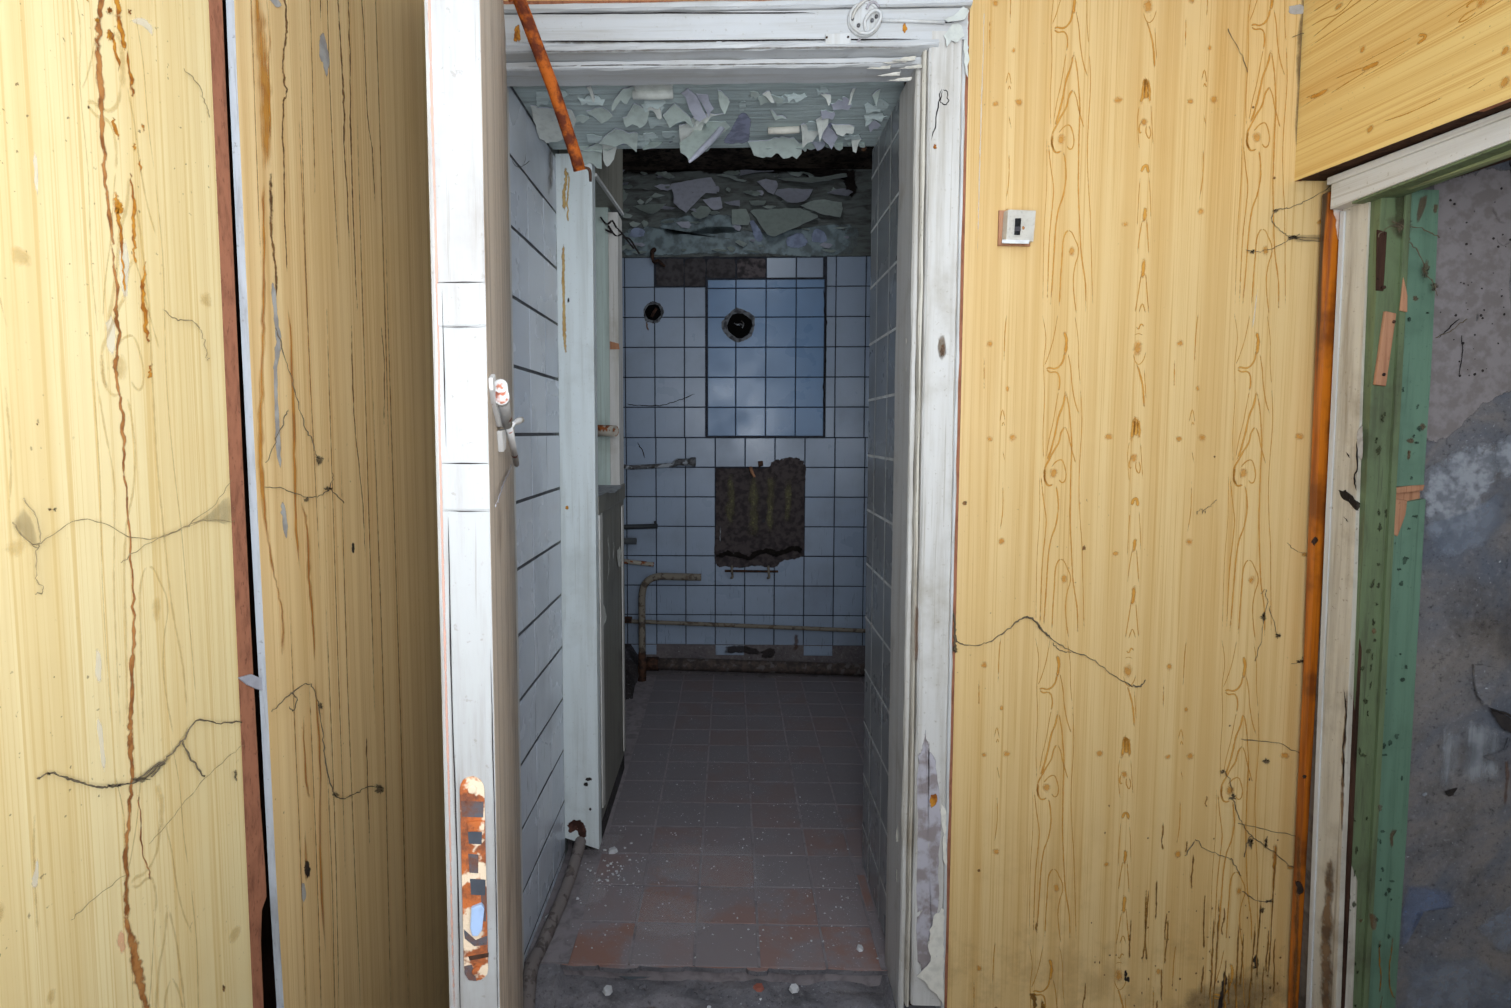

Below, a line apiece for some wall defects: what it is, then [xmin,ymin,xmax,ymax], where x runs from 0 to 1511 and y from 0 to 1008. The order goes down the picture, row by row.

crack [251,5,259,211]
peeling [530,56,922,330]
peeling [944,6,970,77]
corrosion [87,0,151,1008]
crack [291,0,407,997]
peeling [916,730,947,1005]
damp [1444,725,1496,783]
spalling [1472,664,1511,763]